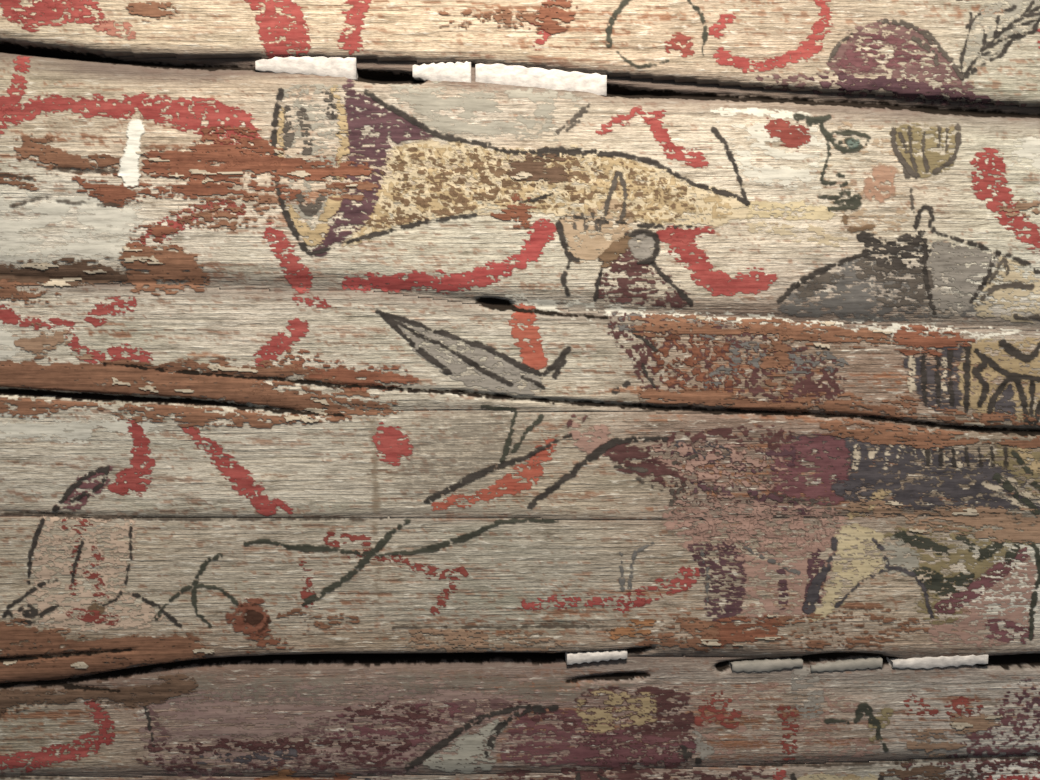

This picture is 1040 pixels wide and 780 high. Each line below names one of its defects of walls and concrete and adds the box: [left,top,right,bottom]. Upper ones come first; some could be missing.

peeling [126,1,178,22]
peeling [438,0,578,34]
crack [0,42,256,71]
crack [356,69,424,84]
crack [607,84,1040,118]
peeling [0,322,419,429]
crack [0,362,1040,436]
peeling [0,618,215,716]
crack [0,623,655,692]
crack [716,653,896,671]
crack [976,653,1040,669]